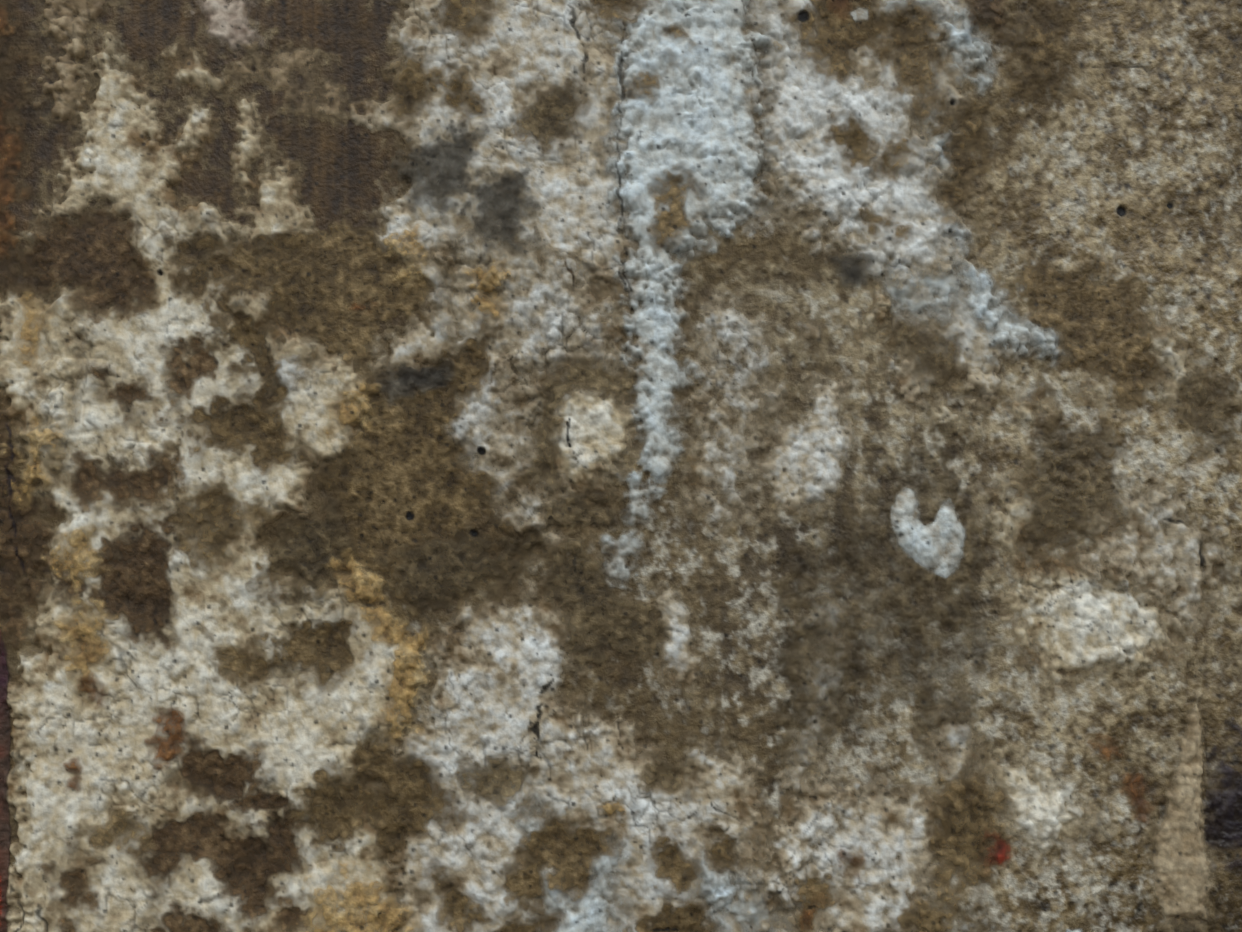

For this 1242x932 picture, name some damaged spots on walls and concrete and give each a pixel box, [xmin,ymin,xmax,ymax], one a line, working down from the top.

peeling [851,8,868,21]
crack [617,52,625,222]
water stain [649,0,1238,535]
water stain [620,472,660,525]
peeling [891,488,968,577]